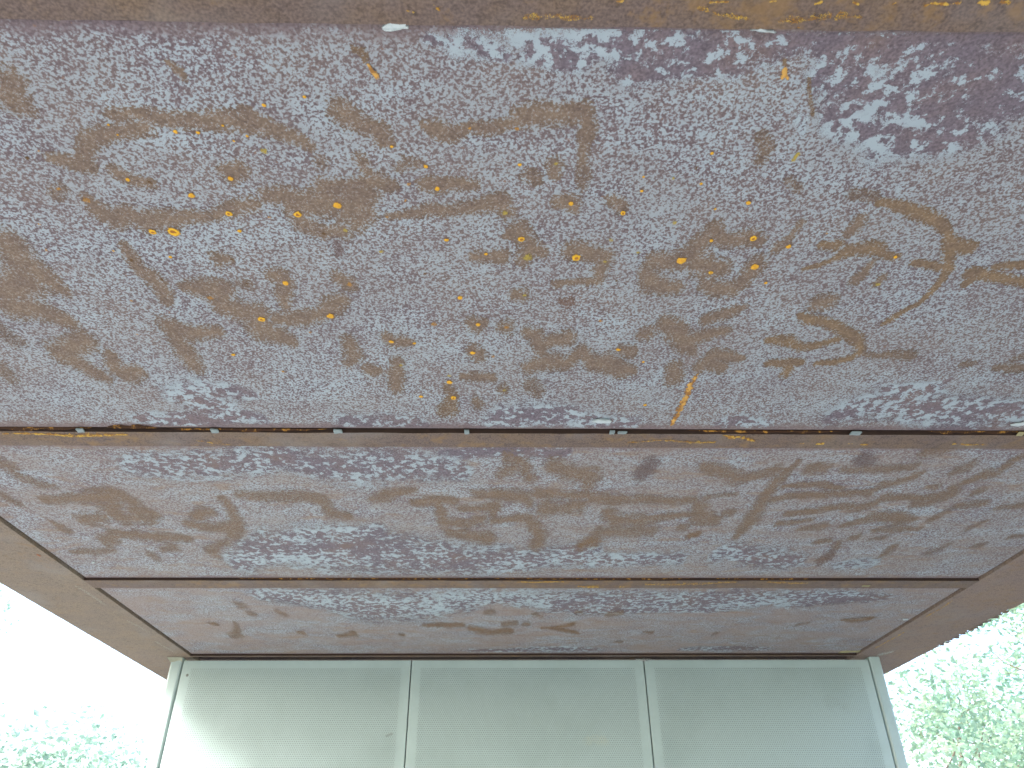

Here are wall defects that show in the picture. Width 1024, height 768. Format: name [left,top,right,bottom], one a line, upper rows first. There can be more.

rust [350,45,379,80]
rust [780,58,789,80]
rust [25,94,618,377]
rust [434,208,808,426]
rust [0,424,155,438]
rust [170,428,322,445]
rust [0,457,353,563]
rust [366,430,1024,566]